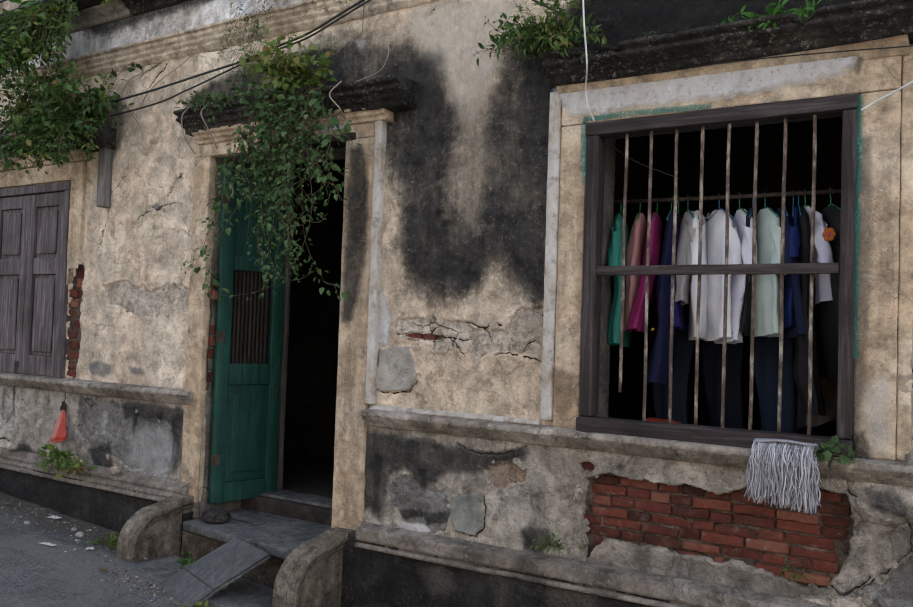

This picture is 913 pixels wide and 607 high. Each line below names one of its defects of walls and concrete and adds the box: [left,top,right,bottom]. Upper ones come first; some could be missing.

leakage [185,0,862,321]
flaking render [66,264,85,379]
flaking render [396,307,544,362]
leakage [89,443,111,467]
leakage [122,402,184,468]
leakage [364,432,526,518]
leakage [399,509,447,532]
flaking render [581,462,854,588]